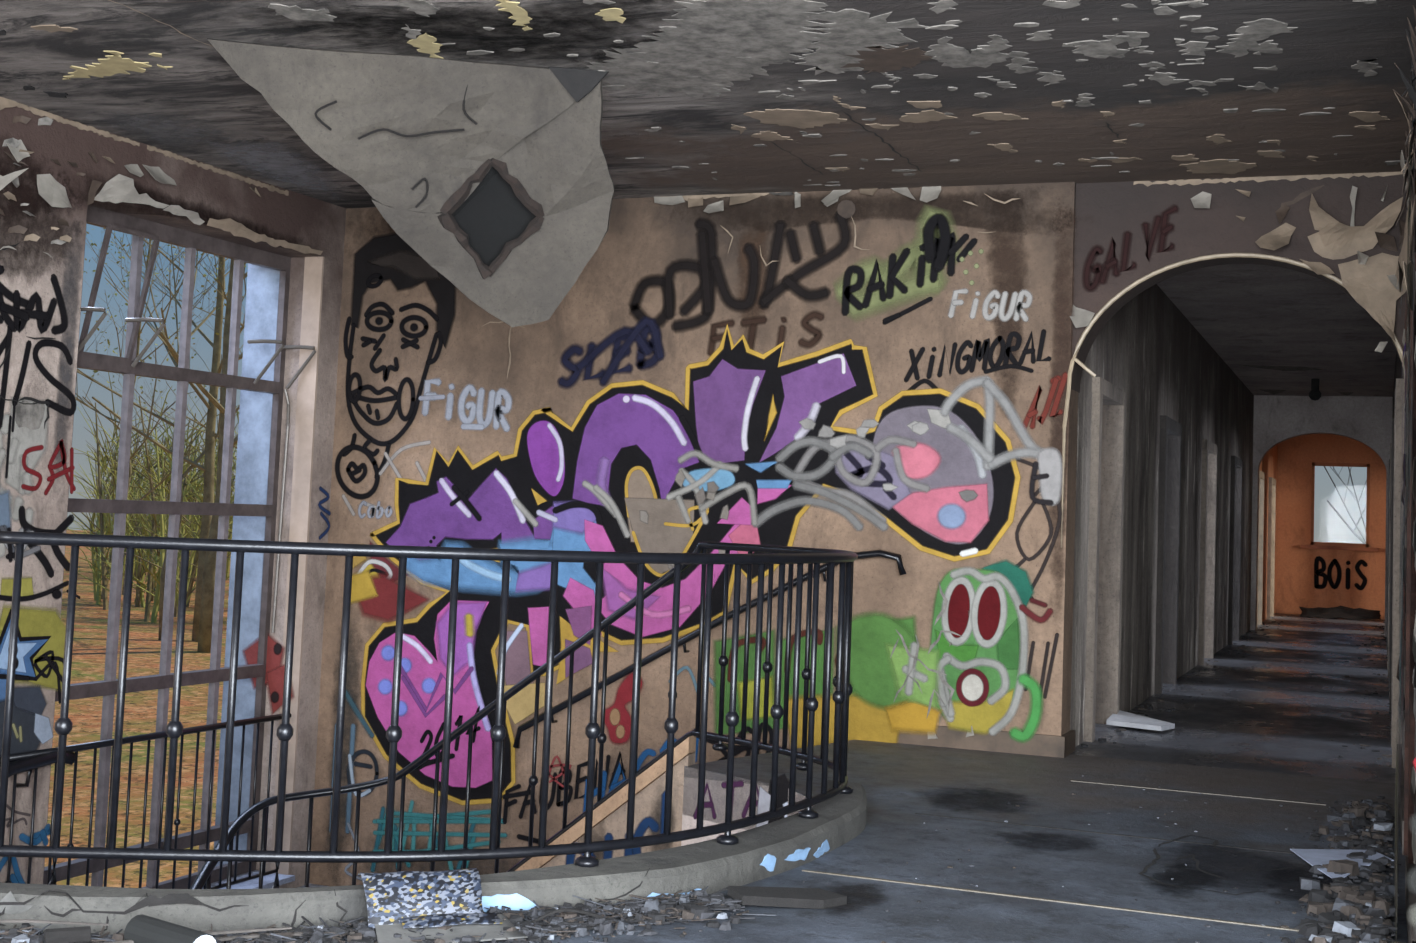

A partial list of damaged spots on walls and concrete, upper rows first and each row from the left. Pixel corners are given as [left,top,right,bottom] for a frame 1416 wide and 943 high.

peeling [268,3,336,21]
peeling [398,0,525,59]
peeling [496,0,560,37]
peeling [0,51,323,255]
peeling [567,0,1416,864]
leakage [932,788,1024,810]
leakage [1004,833,1092,850]
crack [0,890,249,932]
crack [275,889,348,933]
crack [594,868,650,904]
leakage [832,885,881,912]
leakage [1154,846,1348,899]